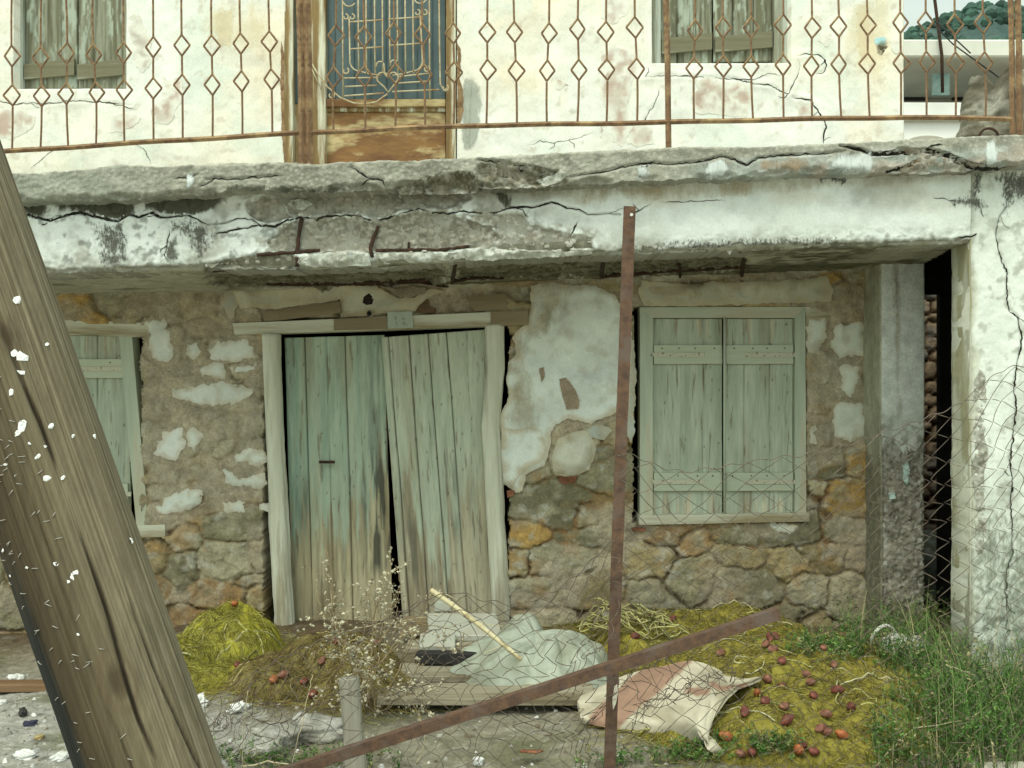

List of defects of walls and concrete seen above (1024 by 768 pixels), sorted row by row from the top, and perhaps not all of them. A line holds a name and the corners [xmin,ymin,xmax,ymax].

damp [59,174,350,271]
crack [27,53,1011,261]
damp [950,140,1024,214]
peeling [153,427,204,461]
peeling [144,318,258,406]
peeling [205,159,833,493]
peeling [805,318,864,442]
crack [959,203,1023,649]
peeling [155,488,203,514]
peeling [222,500,246,513]